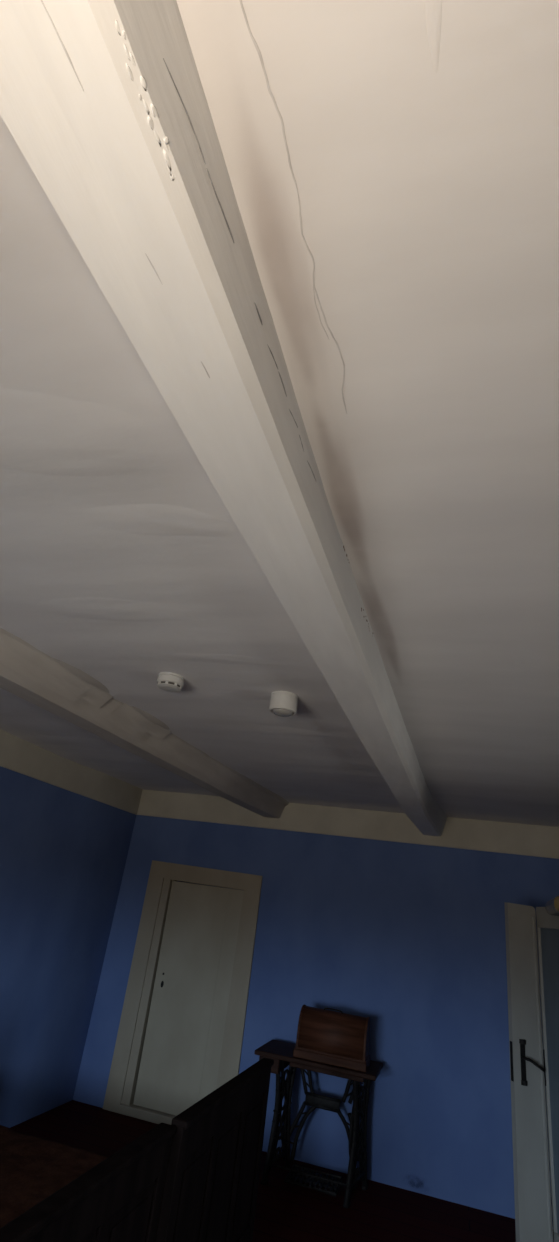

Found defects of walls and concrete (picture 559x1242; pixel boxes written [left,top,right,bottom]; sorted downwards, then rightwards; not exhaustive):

flaking render [116,20,175,180]
crack [163,58,234,243]
crack [239,0,347,414]
crack [254,303,316,480]